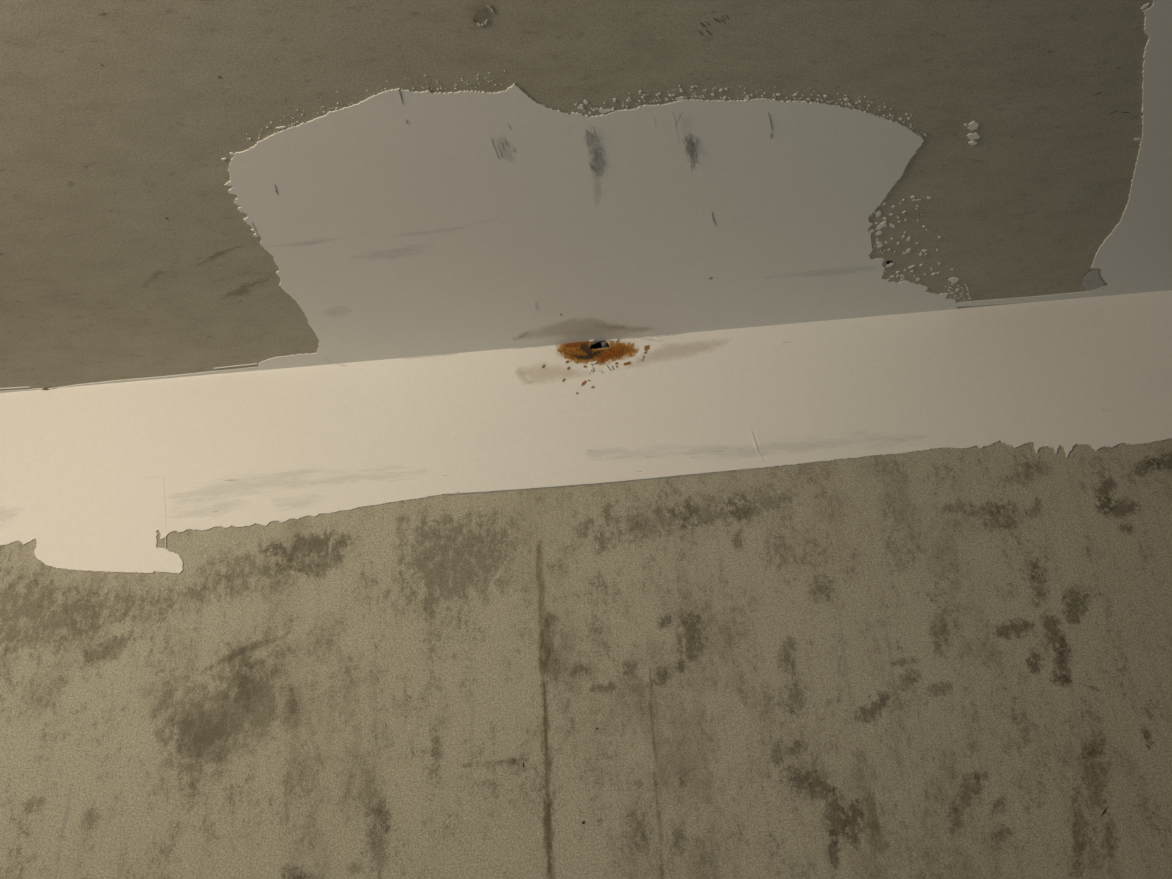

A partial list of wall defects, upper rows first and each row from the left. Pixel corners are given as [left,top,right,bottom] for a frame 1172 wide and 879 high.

flaking render [588,339,618,373]
corrosion [557,340,649,394]